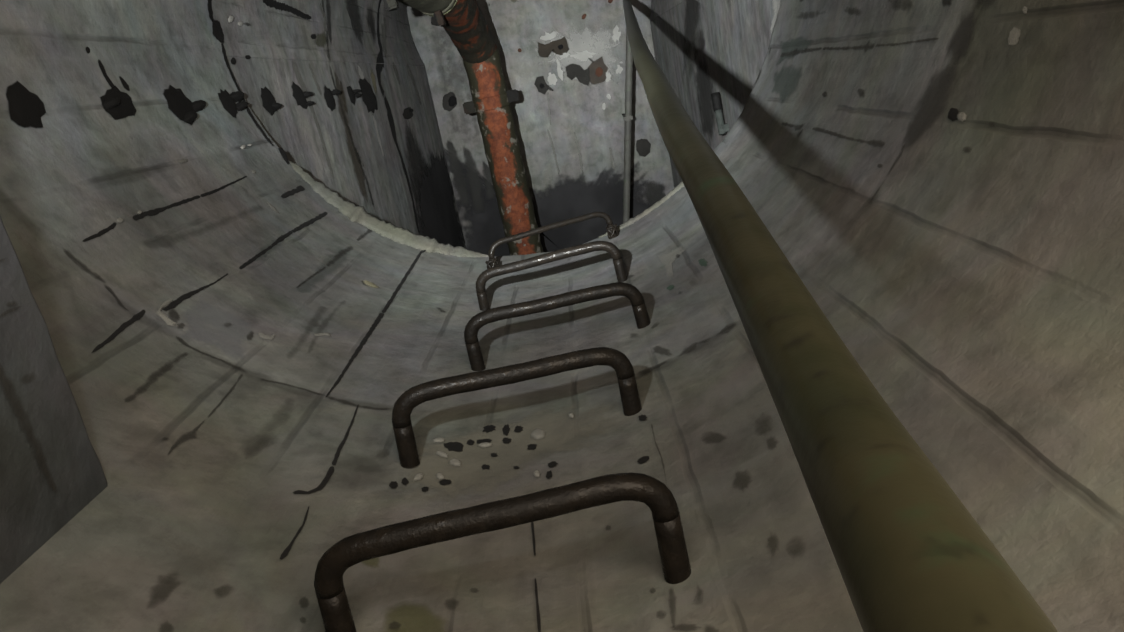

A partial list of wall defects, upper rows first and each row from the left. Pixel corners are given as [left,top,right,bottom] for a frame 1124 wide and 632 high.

damp [948,0,987,56]
peeling [534,76,553,95]
peeling [538,36,611,110]
damp [530,25,665,252]
damp [905,69,953,144]
crack [83,176,247,242]
crack [281,185,305,198]
crack [326,0,426,397]
damp [406,125,510,256]
crack [92,212,327,353]
crack [163,375,242,454]
crack [280,404,359,559]